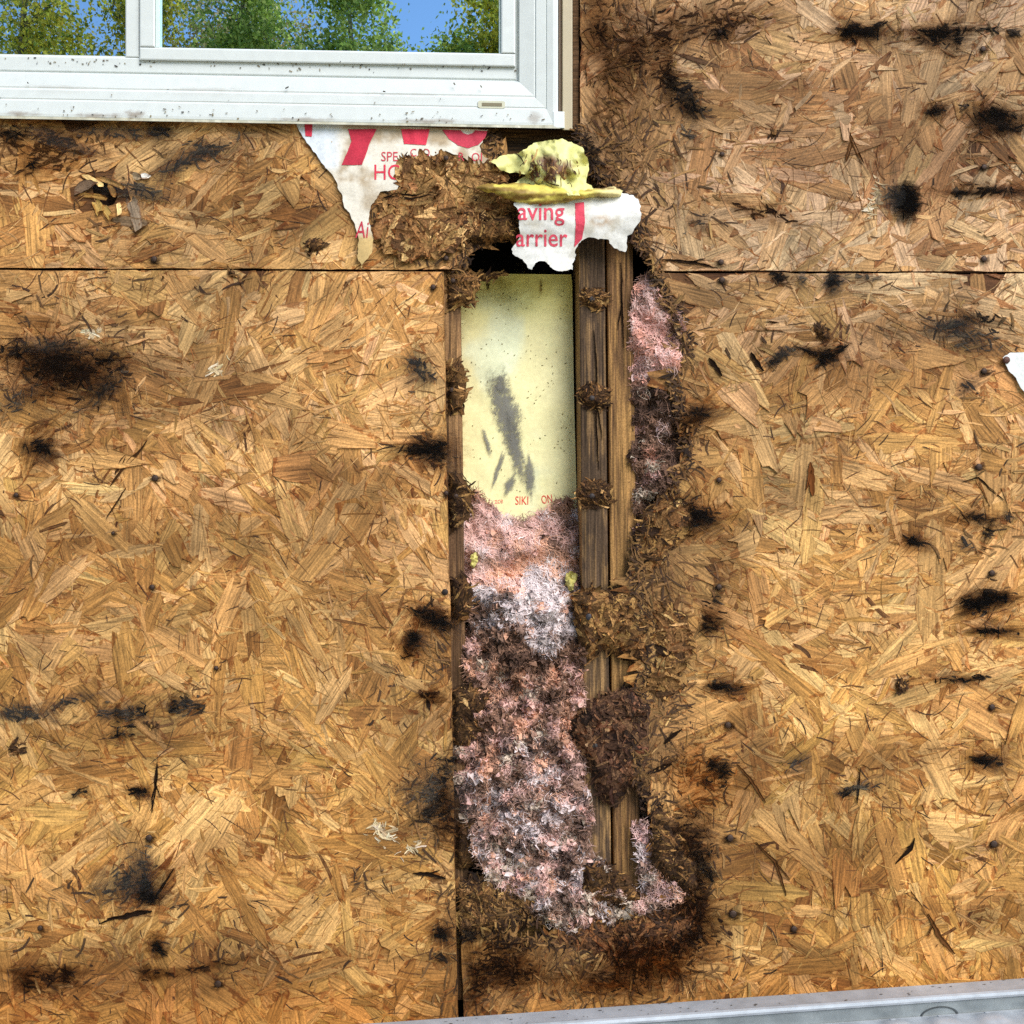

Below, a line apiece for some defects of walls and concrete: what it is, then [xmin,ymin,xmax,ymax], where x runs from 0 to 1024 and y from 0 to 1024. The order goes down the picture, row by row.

damp [582,0,772,166]
spalling [74,171,151,232]
damp [0,327,133,414]
damp [765,344,849,370]
peeling [482,374,535,495]
peeling [698,595,728,634]
damp [960,572,1020,639]
damp [3,694,86,723]
damp [96,701,148,741]
damp [168,695,205,717]
peeling [702,755,735,790]
peeling [663,810,733,969]